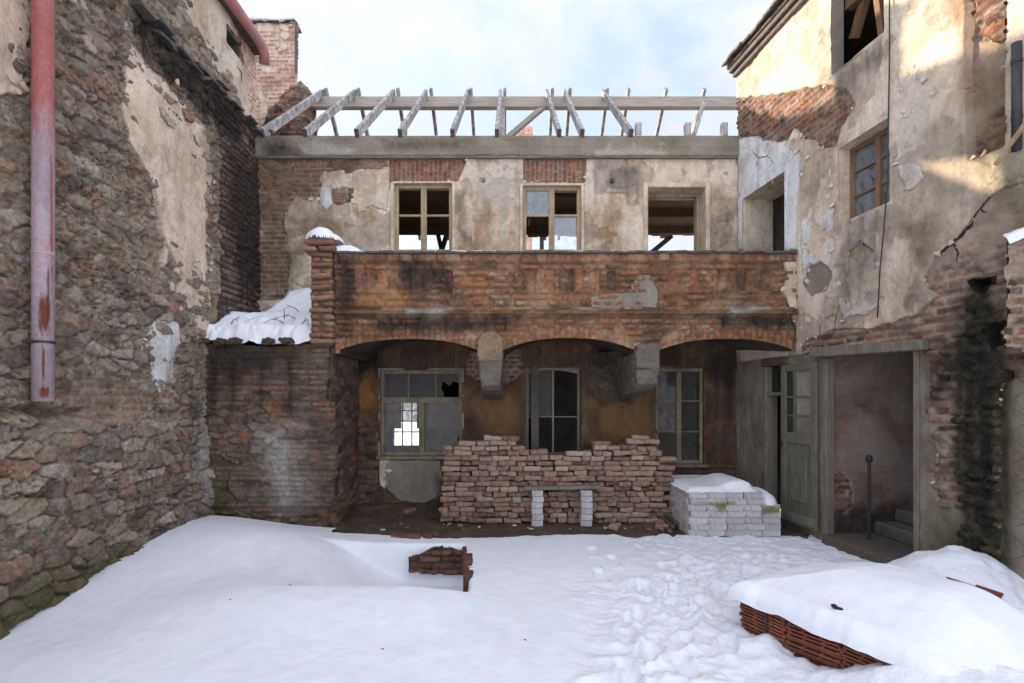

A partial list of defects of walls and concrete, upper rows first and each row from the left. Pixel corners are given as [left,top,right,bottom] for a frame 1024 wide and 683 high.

peeling [0,0,30,96]
peeling [36,129,53,252]
peeling [120,22,217,397]
spalling [257,159,469,300]
crack [937,197,991,261]
corrosion [39,270,50,329]
corrosion [40,350,49,398]
spalling [736,85,1024,559]
damp [929,292,1014,563]